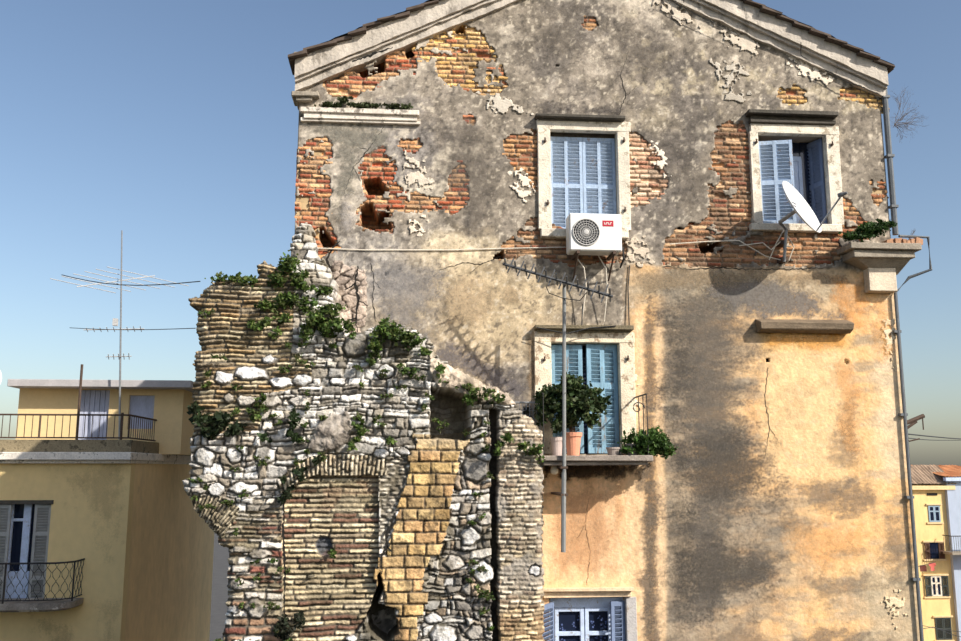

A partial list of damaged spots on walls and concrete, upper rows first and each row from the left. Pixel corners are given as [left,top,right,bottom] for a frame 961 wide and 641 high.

spalling [581,15,599,31]
flaking render [323,25,534,115]
flaking render [294,136,341,259]
flaking render [355,138,470,236]
flaking render [493,120,871,270]
flaking render [869,180,889,207]
crack [323,241,340,268]
crack [345,265,381,332]
water stain [534,268,847,641]
crack [764,369,778,456]